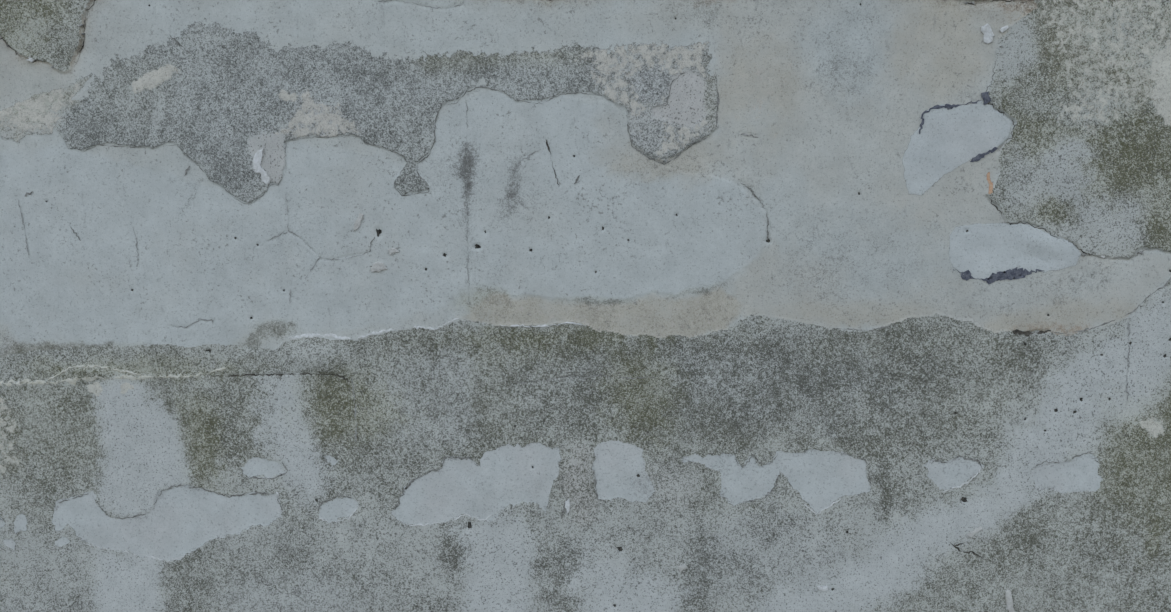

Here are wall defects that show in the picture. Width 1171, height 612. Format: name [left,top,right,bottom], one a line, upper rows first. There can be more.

peeling [0,0,1171,358]
peeling [0,514,28,550]
peeling [52,457,288,561]
peeling [315,495,359,523]
peeling [391,442,561,528]
peeling [591,439,655,503]
peeling [682,449,871,515]
peeling [924,455,984,502]
peeling [1031,451,1105,493]